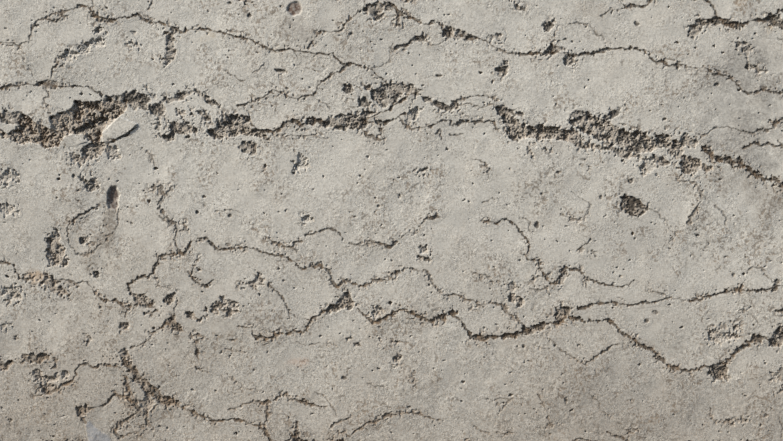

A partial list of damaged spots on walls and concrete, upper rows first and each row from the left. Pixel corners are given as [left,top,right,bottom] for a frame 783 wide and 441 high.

spalling [0,83,268,256]
spalling [320,75,456,136]
crack [0,0,783,198]
spalling [491,98,748,188]
spalling [0,319,22,343]
spalling [0,283,28,308]
spalling [34,225,75,302]
spalling [88,266,103,281]
crack [0,146,783,441]